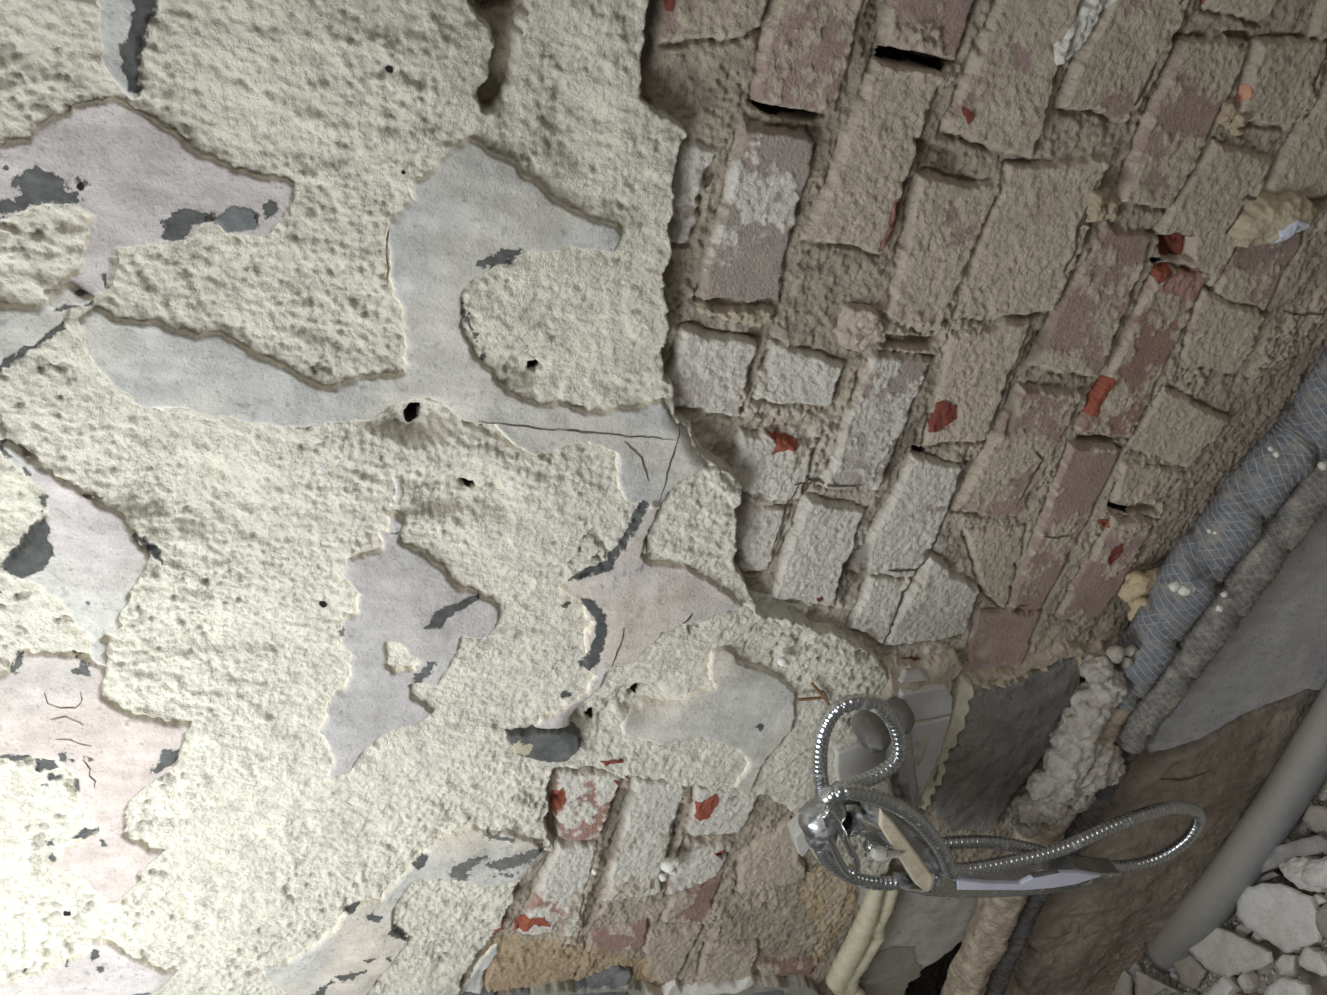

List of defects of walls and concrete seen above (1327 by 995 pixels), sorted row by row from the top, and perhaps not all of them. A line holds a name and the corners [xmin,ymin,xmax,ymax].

flaking render [0,0,1327,729]
peeling [0,414,192,905]
peeling [318,474,500,780]
flaking render [262,646,860,995]
flaking render [889,858,905,871]
crack [877,533,939,646]
flaking render [919,755,1044,862]
flaking render [1082,941,1147,995]